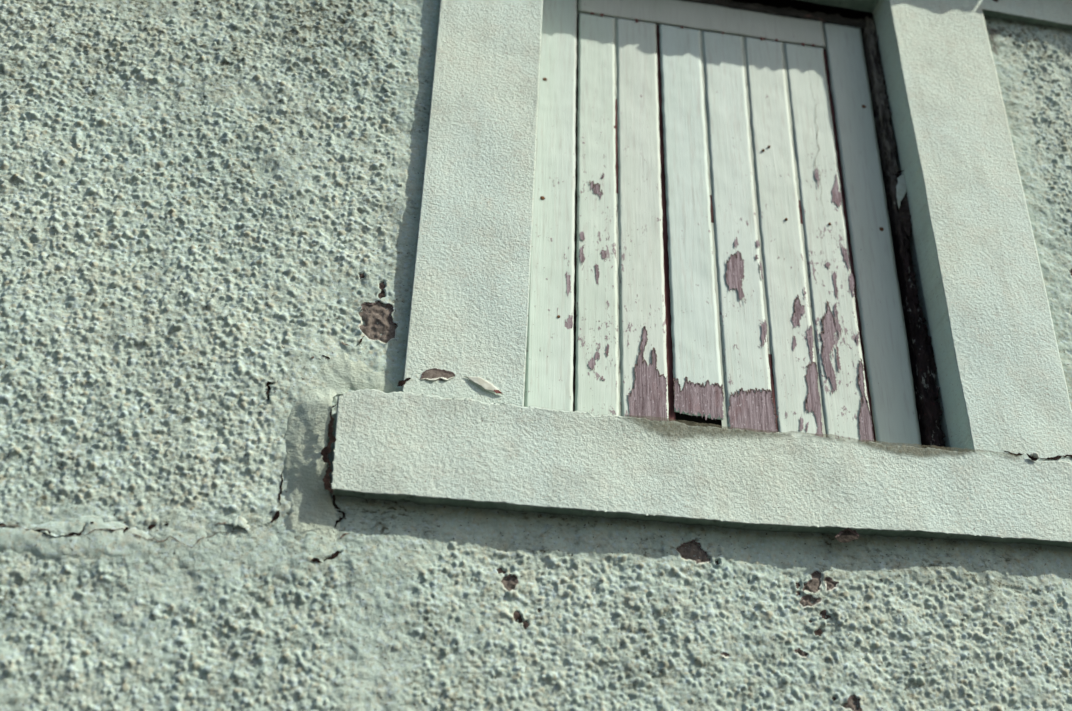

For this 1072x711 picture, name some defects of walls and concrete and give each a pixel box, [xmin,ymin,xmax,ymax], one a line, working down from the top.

peeling [725,237,763,303]
spalling [342,282,398,346]
peeling [791,244,854,437]
spalling [397,368,503,394]
peeling [628,326,778,433]
crack [0,472,283,548]
crack [311,403,350,563]
crack [1004,451,1072,461]
spalling [497,568,519,591]
spalling [513,611,529,629]
spalling [795,571,838,636]
spalling [832,694,862,711]